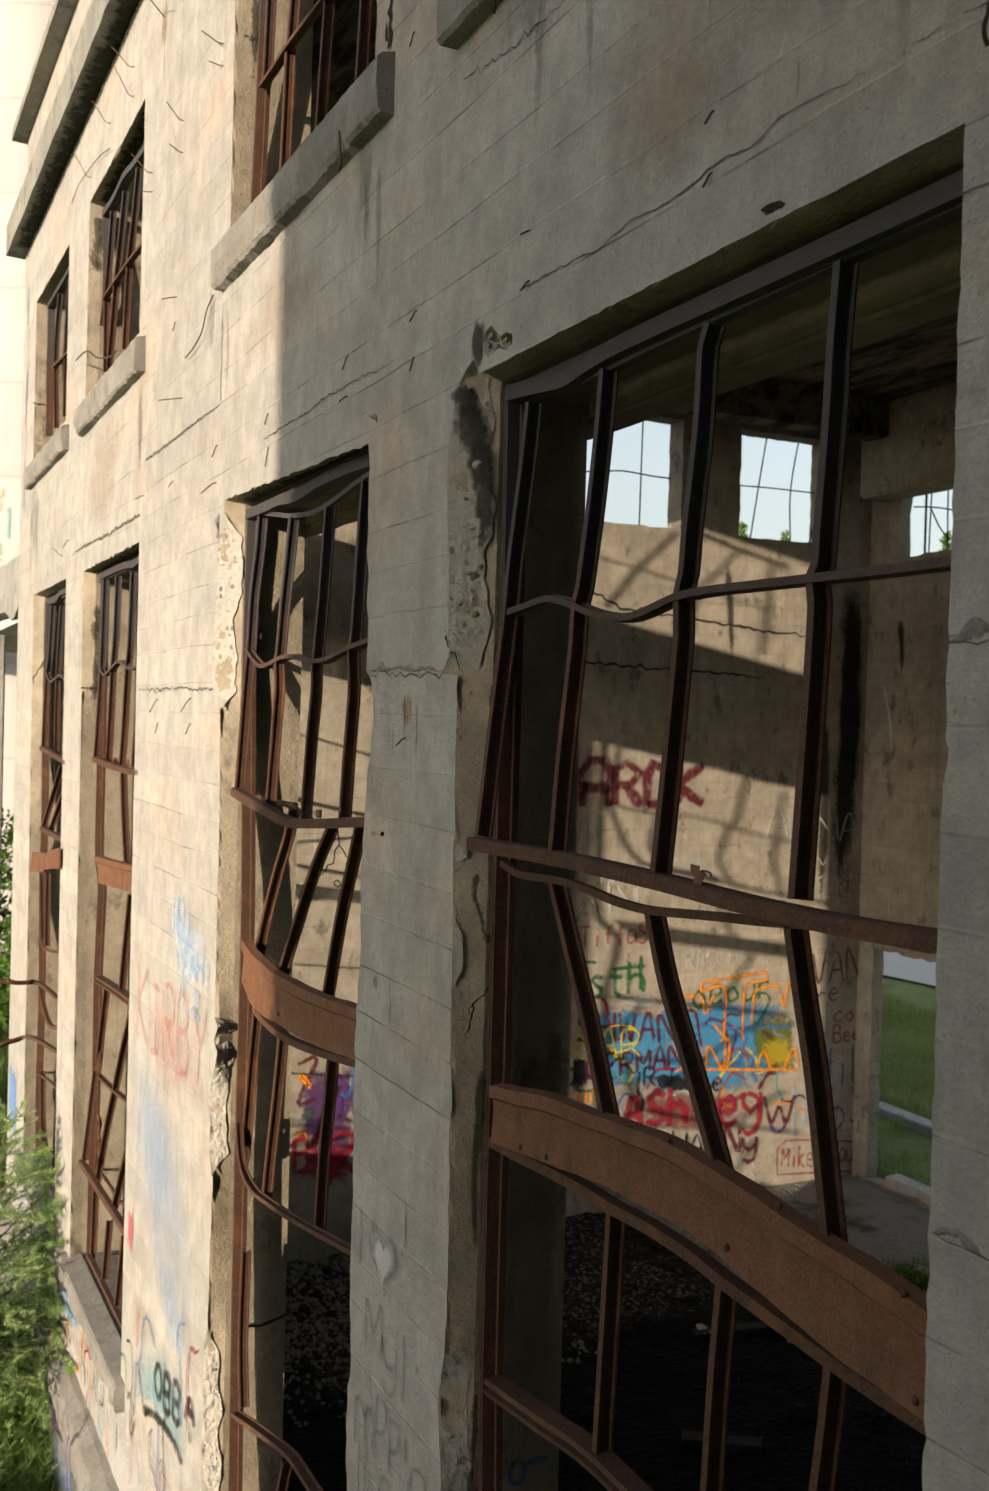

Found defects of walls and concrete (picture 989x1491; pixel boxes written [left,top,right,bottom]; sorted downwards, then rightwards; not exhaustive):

crack [464,1,563,80]
crack [523,73,864,289]
spalling [367,323,513,672]
spalling [212,514,243,710]
crack [368,670,443,679]
crack [949,638,989,646]
spalling [438,1354,471,1491]